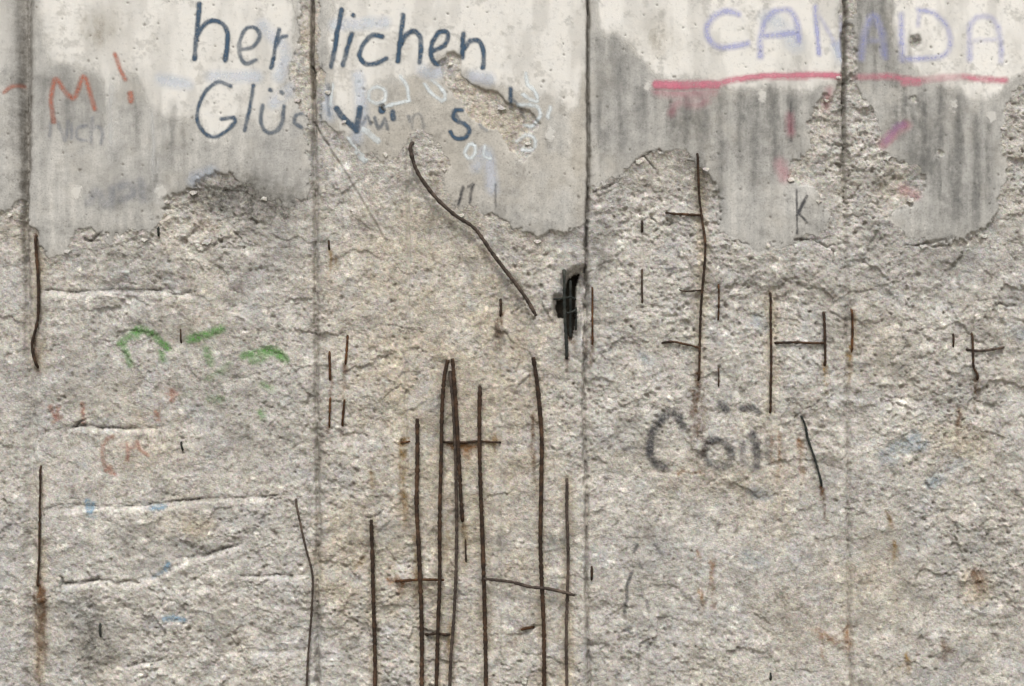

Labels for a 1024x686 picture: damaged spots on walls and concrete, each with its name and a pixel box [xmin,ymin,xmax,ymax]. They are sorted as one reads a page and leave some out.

corrosion [33,578,47,651]
spalling [0,0,588,686]
spalling [583,0,1024,686]